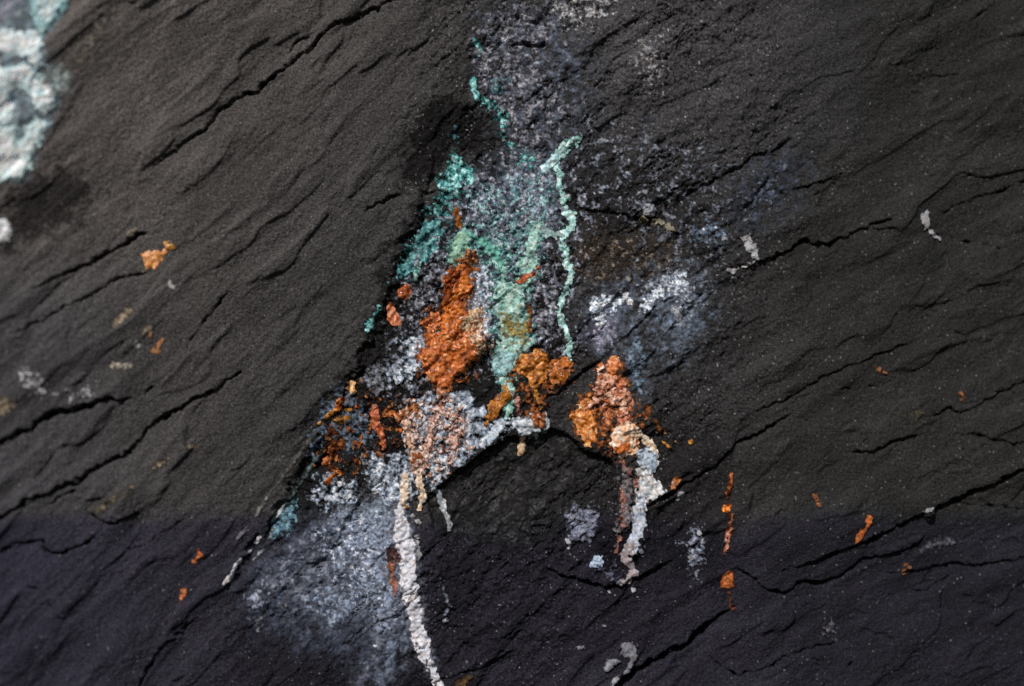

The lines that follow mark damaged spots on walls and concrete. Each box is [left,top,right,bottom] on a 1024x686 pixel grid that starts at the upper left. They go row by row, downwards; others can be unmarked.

crack [201,73,277,134]
crack [69,233,146,273]
rust [141,241,176,274]
crack [164,371,242,419]
crack [0,397,123,443]
rust [312,378,421,487]
crack [0,450,131,519]
crack [647,469,710,507]
rust [721,470,734,555]
rust [855,515,873,544]
rust [720,571,736,611]
crack [618,611,724,683]